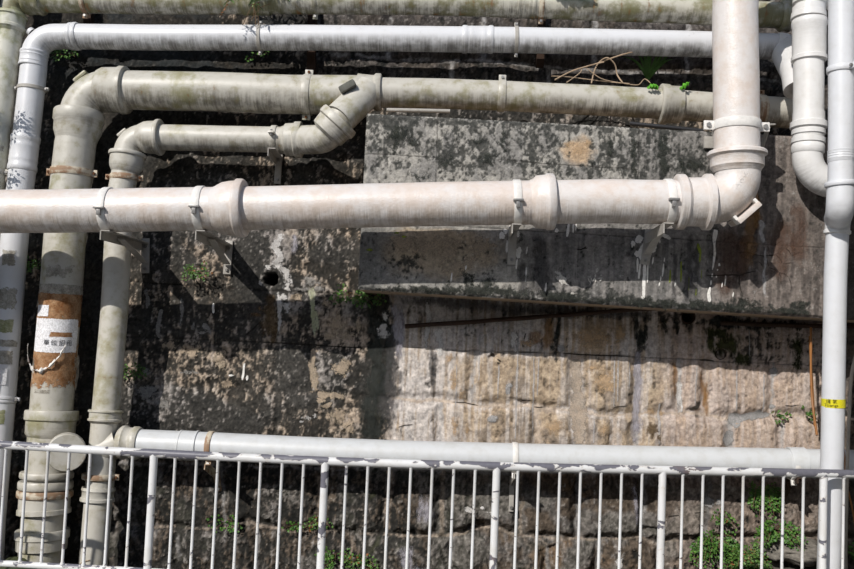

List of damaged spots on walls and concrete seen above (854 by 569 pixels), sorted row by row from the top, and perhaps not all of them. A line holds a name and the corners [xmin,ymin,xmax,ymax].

leakage [384,125,418,154]
leakage [630,134,638,176]
leakage [654,133,704,177]
leakage [360,220,811,441]